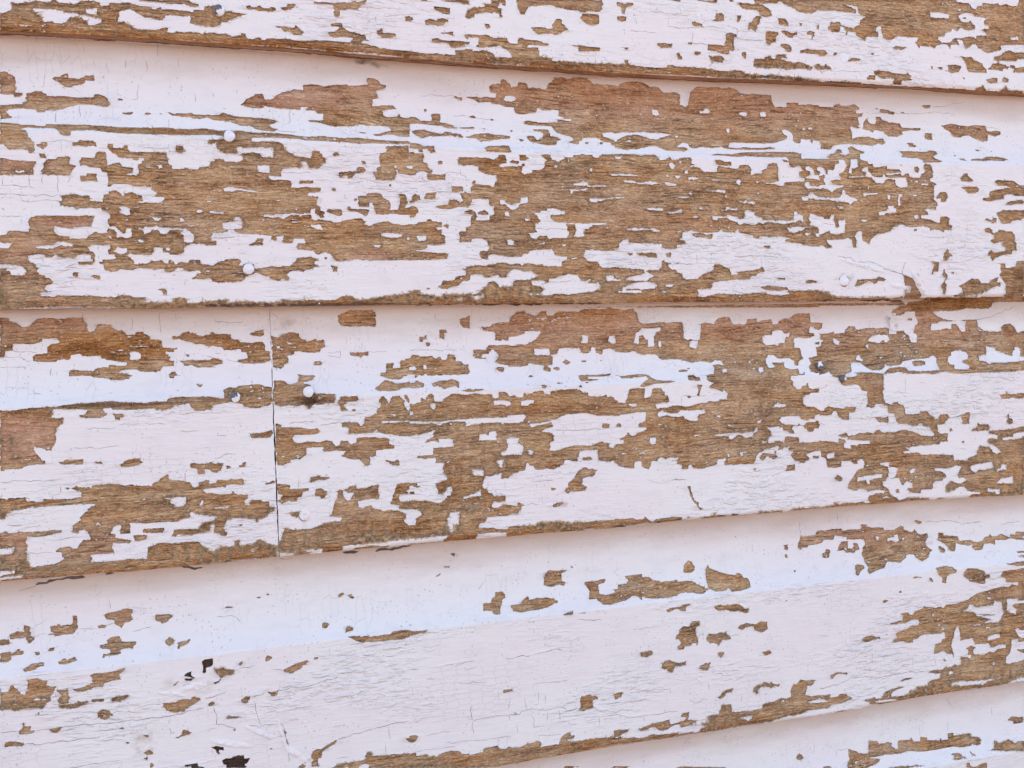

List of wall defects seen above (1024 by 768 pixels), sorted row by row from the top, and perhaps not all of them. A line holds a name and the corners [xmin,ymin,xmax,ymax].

peeling [0,0,1024,580]
peeling [483,570,565,615]
peeling [584,561,750,612]
peeling [0,625,35,662]
peeling [50,615,78,636]
peeling [100,608,136,656]
peeling [350,630,425,643]
peeling [675,621,729,649]
peeling [865,562,1024,704]
peeling [0,662,125,710]
peeling [335,679,851,768]
peeling [847,733,986,768]